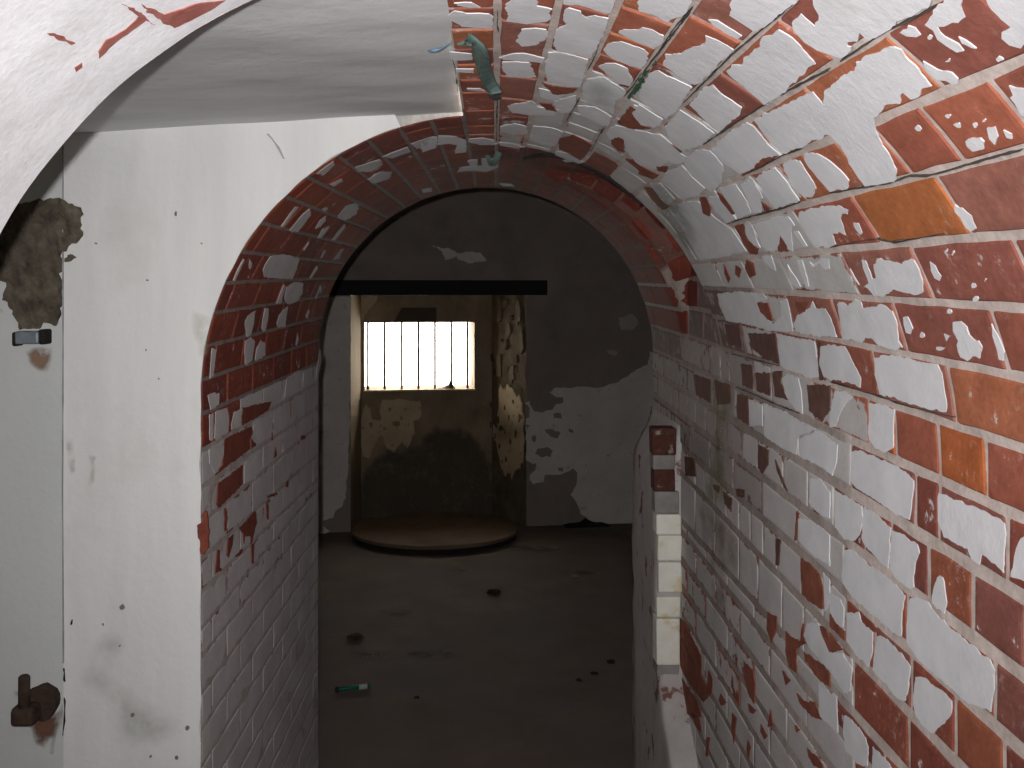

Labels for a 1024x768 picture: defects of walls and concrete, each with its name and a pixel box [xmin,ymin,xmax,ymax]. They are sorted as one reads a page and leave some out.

peeling [47,33,75,45]
peeling [98,0,226,59]
peeling [986,0,1024,49]
peeling [1009,85,1024,116]
spalling [0,198,84,330]
rust [30,350,50,369]
peeling [209,348,217,379]
peeling [233,203,422,534]
peeling [355,0,1013,768]
peeling [197,392,289,574]
peeling [938,493,1024,581]
rust [33,716,58,743]